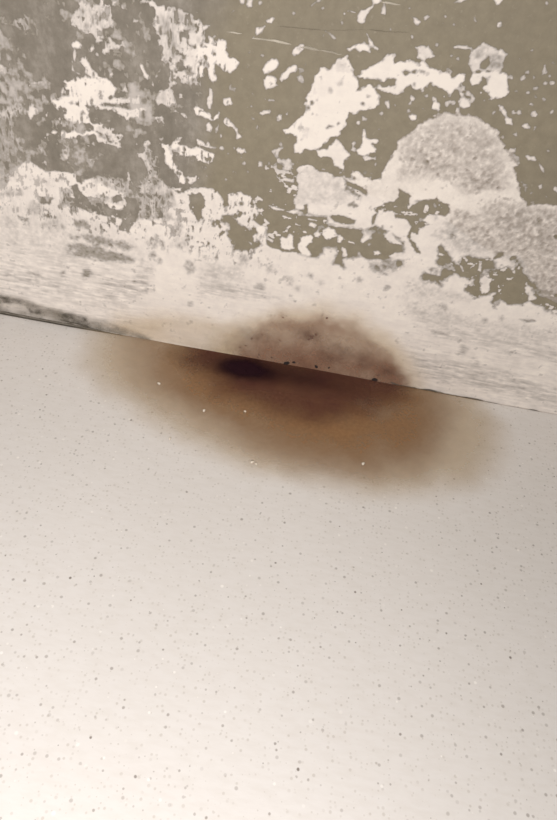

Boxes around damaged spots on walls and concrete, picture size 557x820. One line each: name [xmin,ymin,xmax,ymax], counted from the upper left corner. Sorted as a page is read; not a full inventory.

peeling [0,0,557,414]
damp [117,333,474,476]